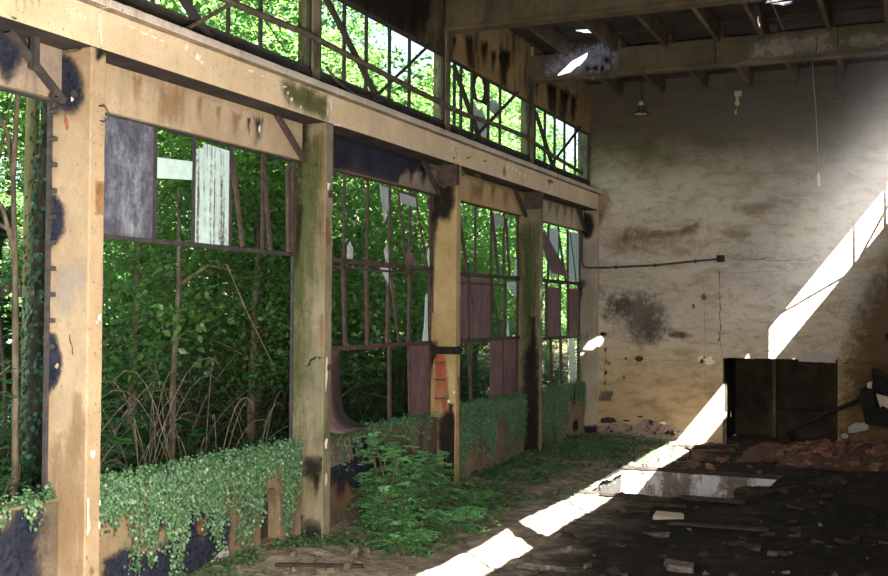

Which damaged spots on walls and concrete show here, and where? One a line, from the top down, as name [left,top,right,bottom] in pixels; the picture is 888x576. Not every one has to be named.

damp [481,42,510,85]
damp [560,90,577,120]
damp [607,290,689,343]
crack [692,255,818,352]
damp [838,263,888,443]
spalling [598,416,689,442]